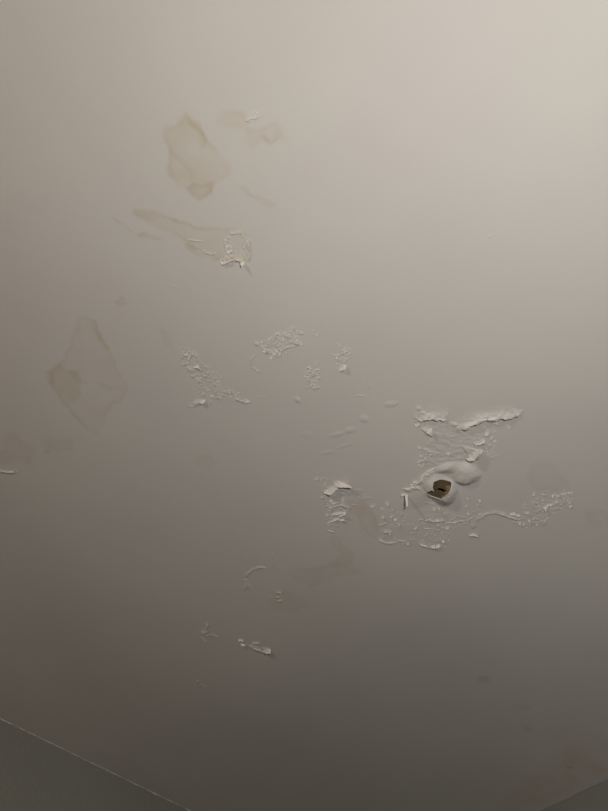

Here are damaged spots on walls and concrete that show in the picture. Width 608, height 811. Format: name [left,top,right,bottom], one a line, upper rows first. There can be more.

water stain [160,109,234,204]
peeling [408,403,525,468]
peeling [313,476,374,533]
spalling [427,479,452,500]